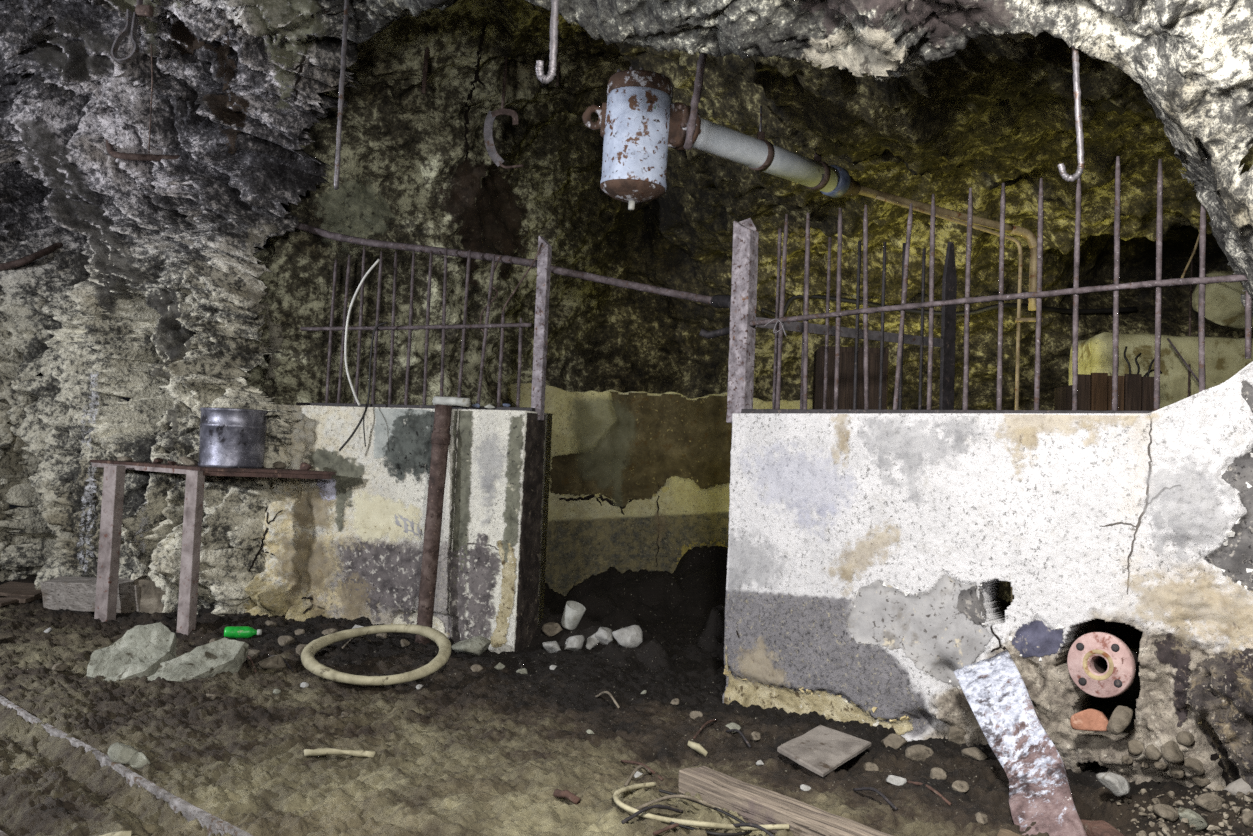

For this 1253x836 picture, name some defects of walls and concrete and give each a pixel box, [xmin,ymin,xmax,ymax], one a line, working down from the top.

damp [304,408,435,624]
peeling [549,392,732,506]
crack [1103,415,1181,594]
peeling [1204,447,1253,592]
peeling [1241,380,1253,419]
flaking render [490,540,517,648]
flaking render [723,646,913,735]
peeling [846,571,994,689]
flaking render [1009,619,1065,661]
flaking render [1186,648,1253,790]